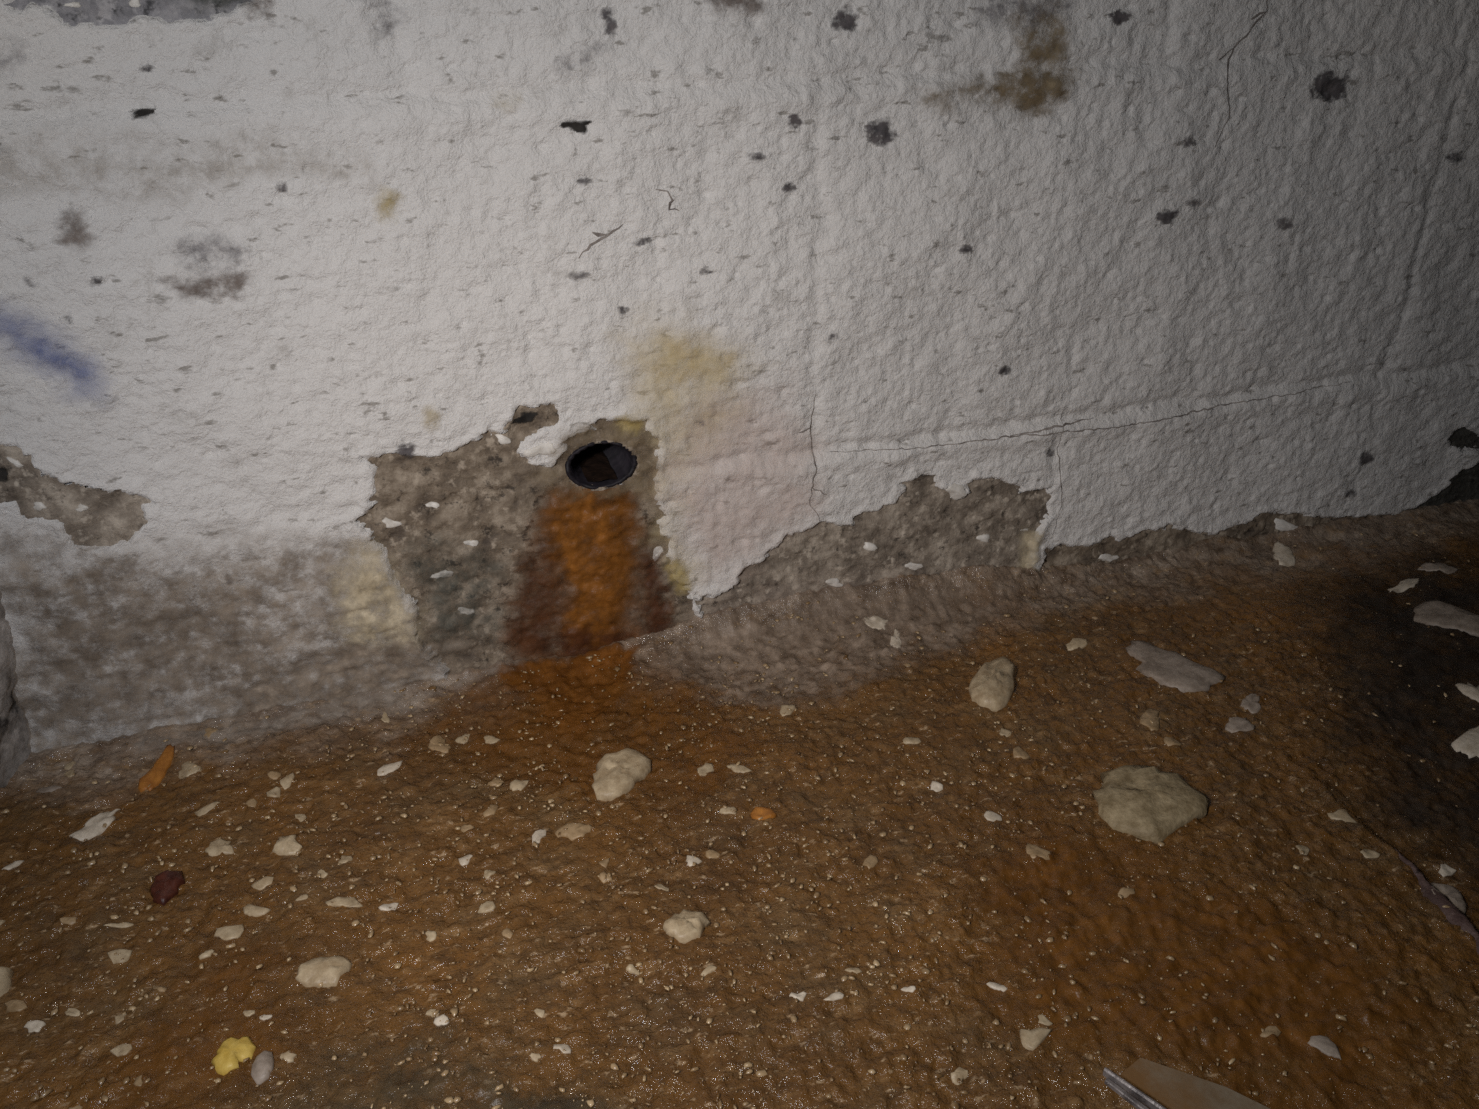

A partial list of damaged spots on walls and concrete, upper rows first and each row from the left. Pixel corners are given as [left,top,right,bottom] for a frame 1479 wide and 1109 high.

peeling [0,445,151,546]
peeling [1412,427,1479,509]
peeling [356,403,1384,674]
peeling [1388,562,1459,593]
corrosion [442,489,740,796]
peeling [1140,708,1182,746]
peeling [1225,694,1261,733]
peeling [1455,682,1479,702]